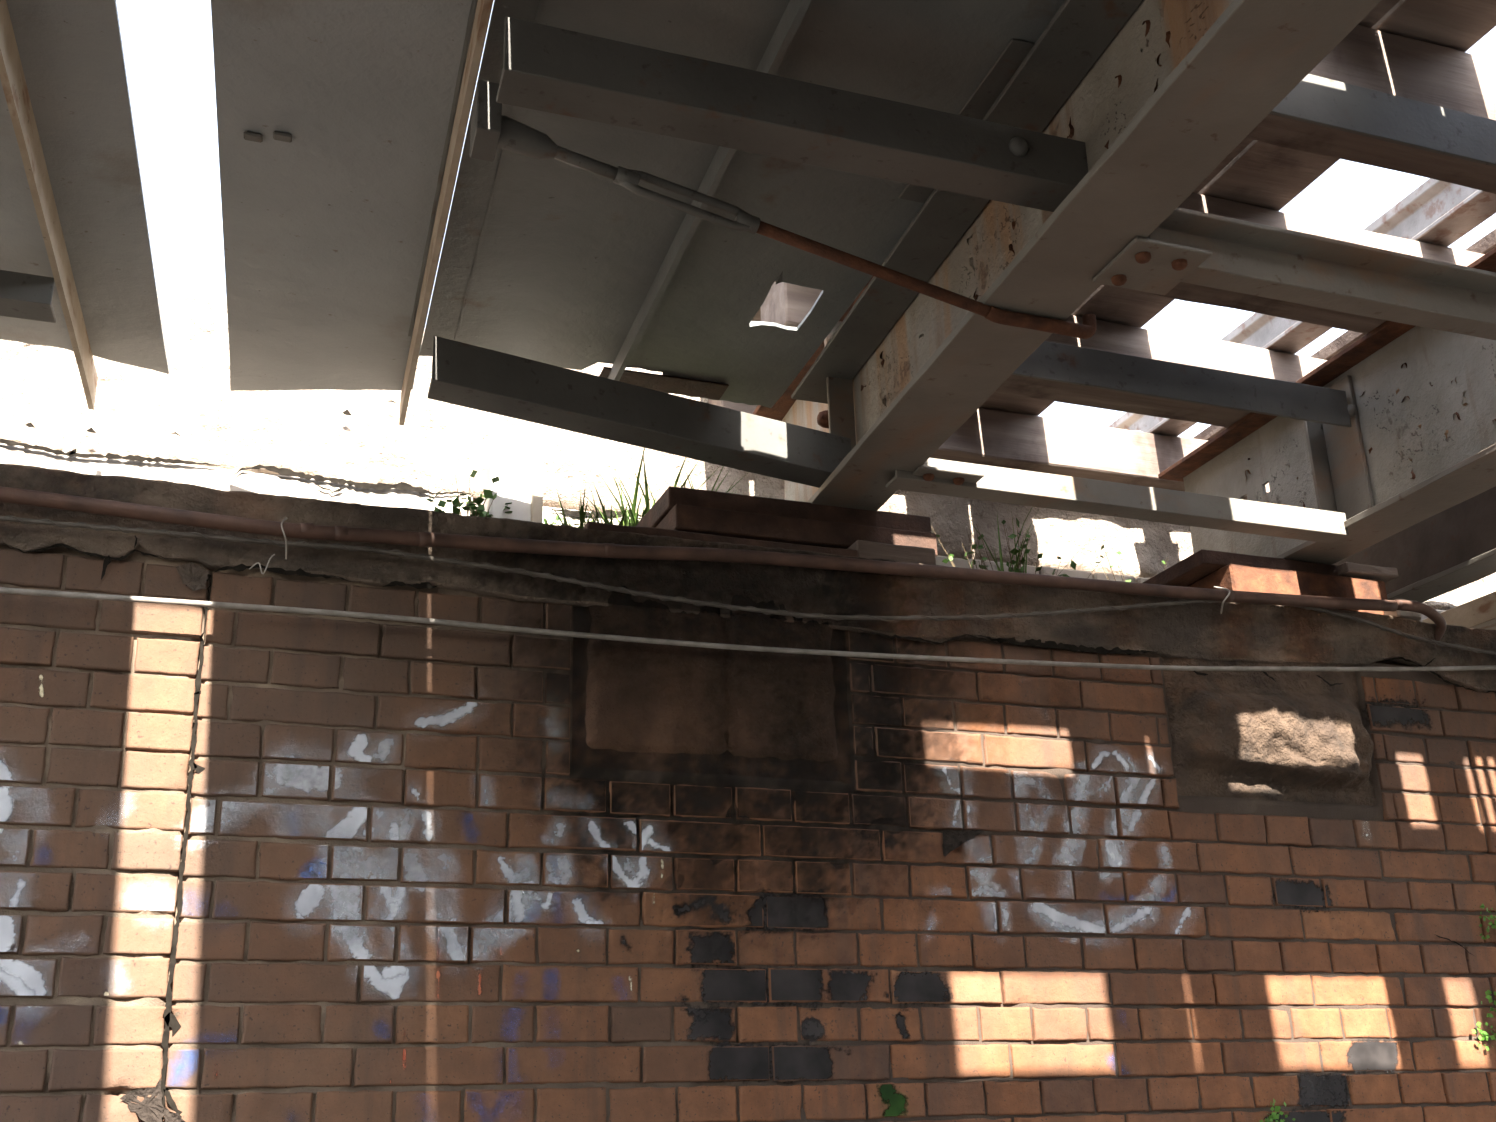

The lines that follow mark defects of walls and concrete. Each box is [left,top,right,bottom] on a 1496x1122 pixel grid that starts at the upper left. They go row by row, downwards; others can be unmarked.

spalling [176,562,209,591]
crack [4,536,437,1119]
water stain [850,572,905,845]